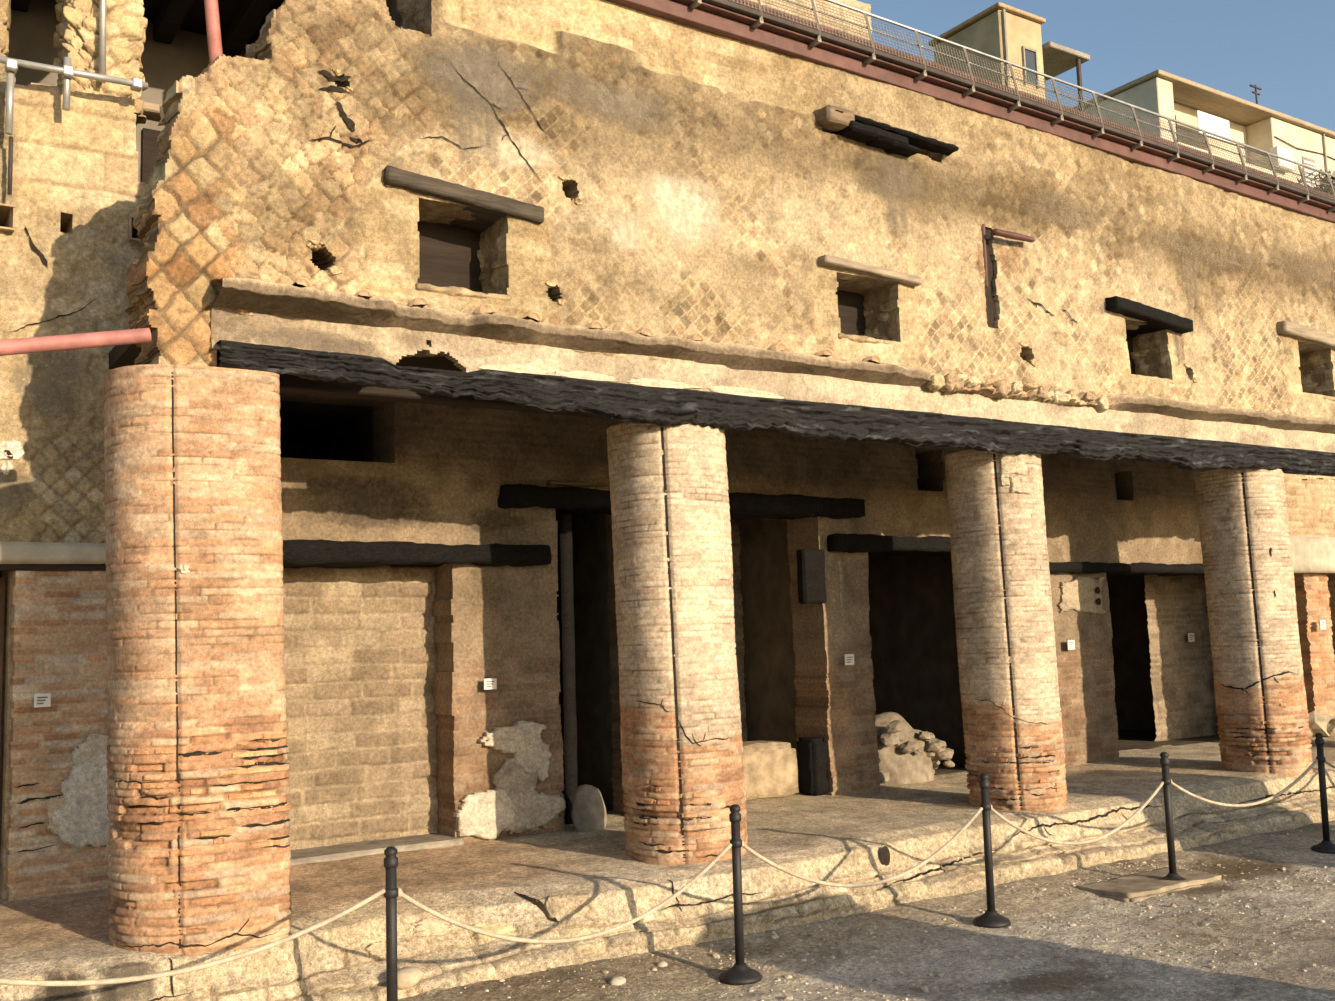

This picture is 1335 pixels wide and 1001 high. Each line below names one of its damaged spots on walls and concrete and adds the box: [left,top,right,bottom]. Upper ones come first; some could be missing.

spalling [318,70,363,145]
crack [421,60,551,183]
crack [638,699,728,746]
crack [1218,671,1293,694]
flaking render [45,732,292,856]
crack [878,805,1162,890]